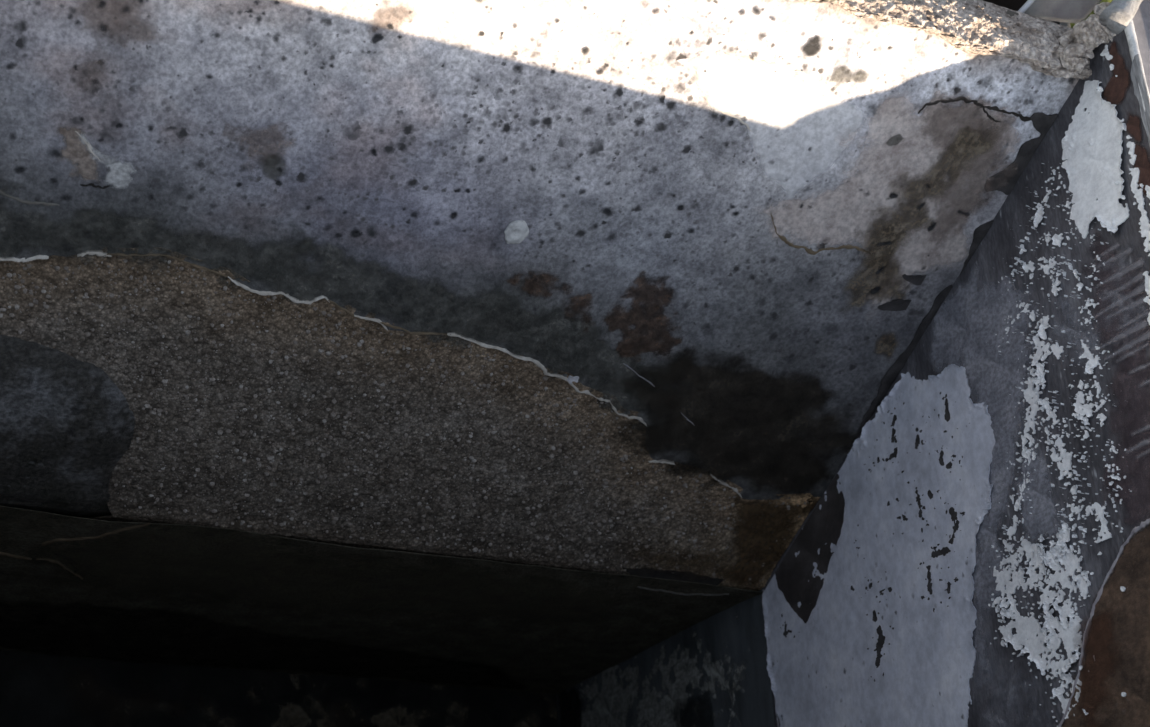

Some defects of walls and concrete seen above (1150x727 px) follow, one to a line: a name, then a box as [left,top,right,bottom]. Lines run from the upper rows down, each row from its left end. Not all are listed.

peeling [694,52,1058,311]
spalling [801,0,1072,78]
crack [918,97,1032,123]
peeling [1100,44,1117,77]
rust [1103,41,1150,195]
water stain [0,188,858,495]
spalling [0,248,1000,727]
rust [508,271,682,360]
peeling [988,58,1150,727]
rust [1061,236,1150,727]